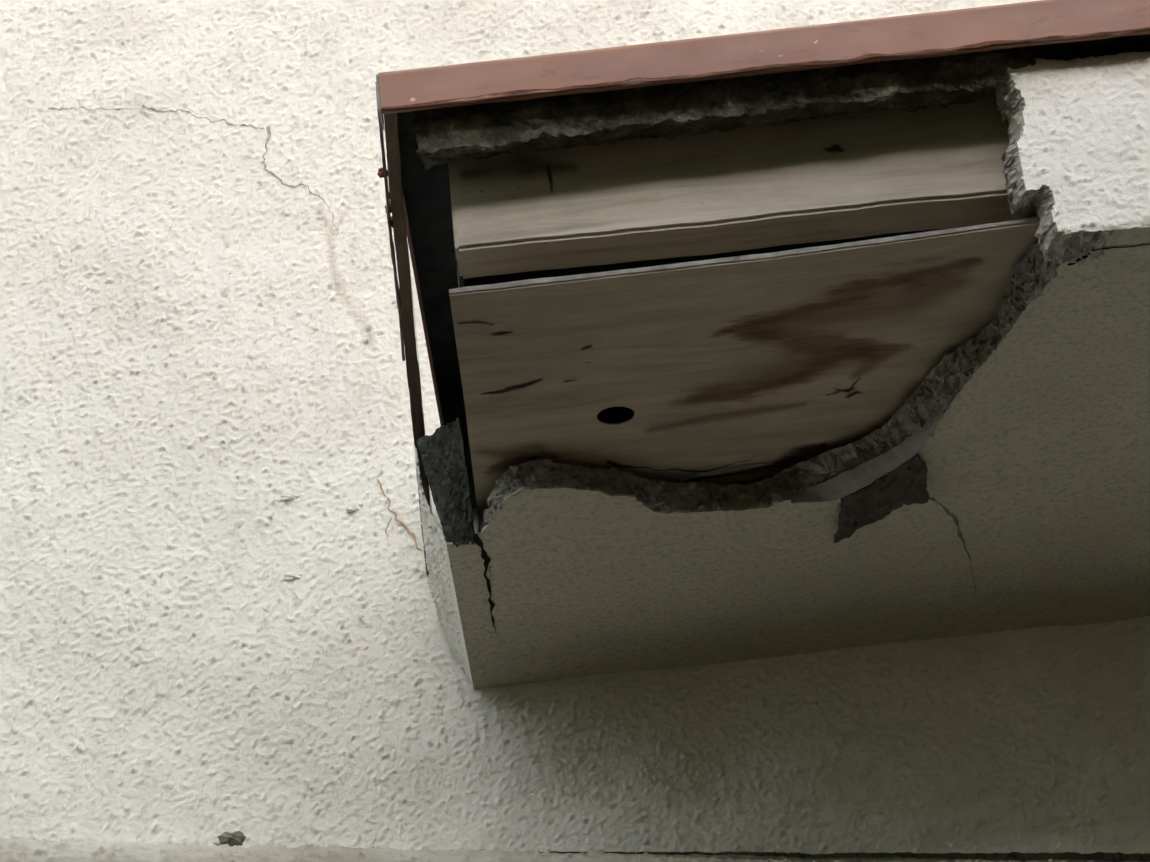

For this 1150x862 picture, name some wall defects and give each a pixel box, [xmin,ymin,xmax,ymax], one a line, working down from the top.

crack [48,104,338,235]
flaking render [416,70,1116,588]
leakage [689,259,981,402]
crack [473,534,497,636]